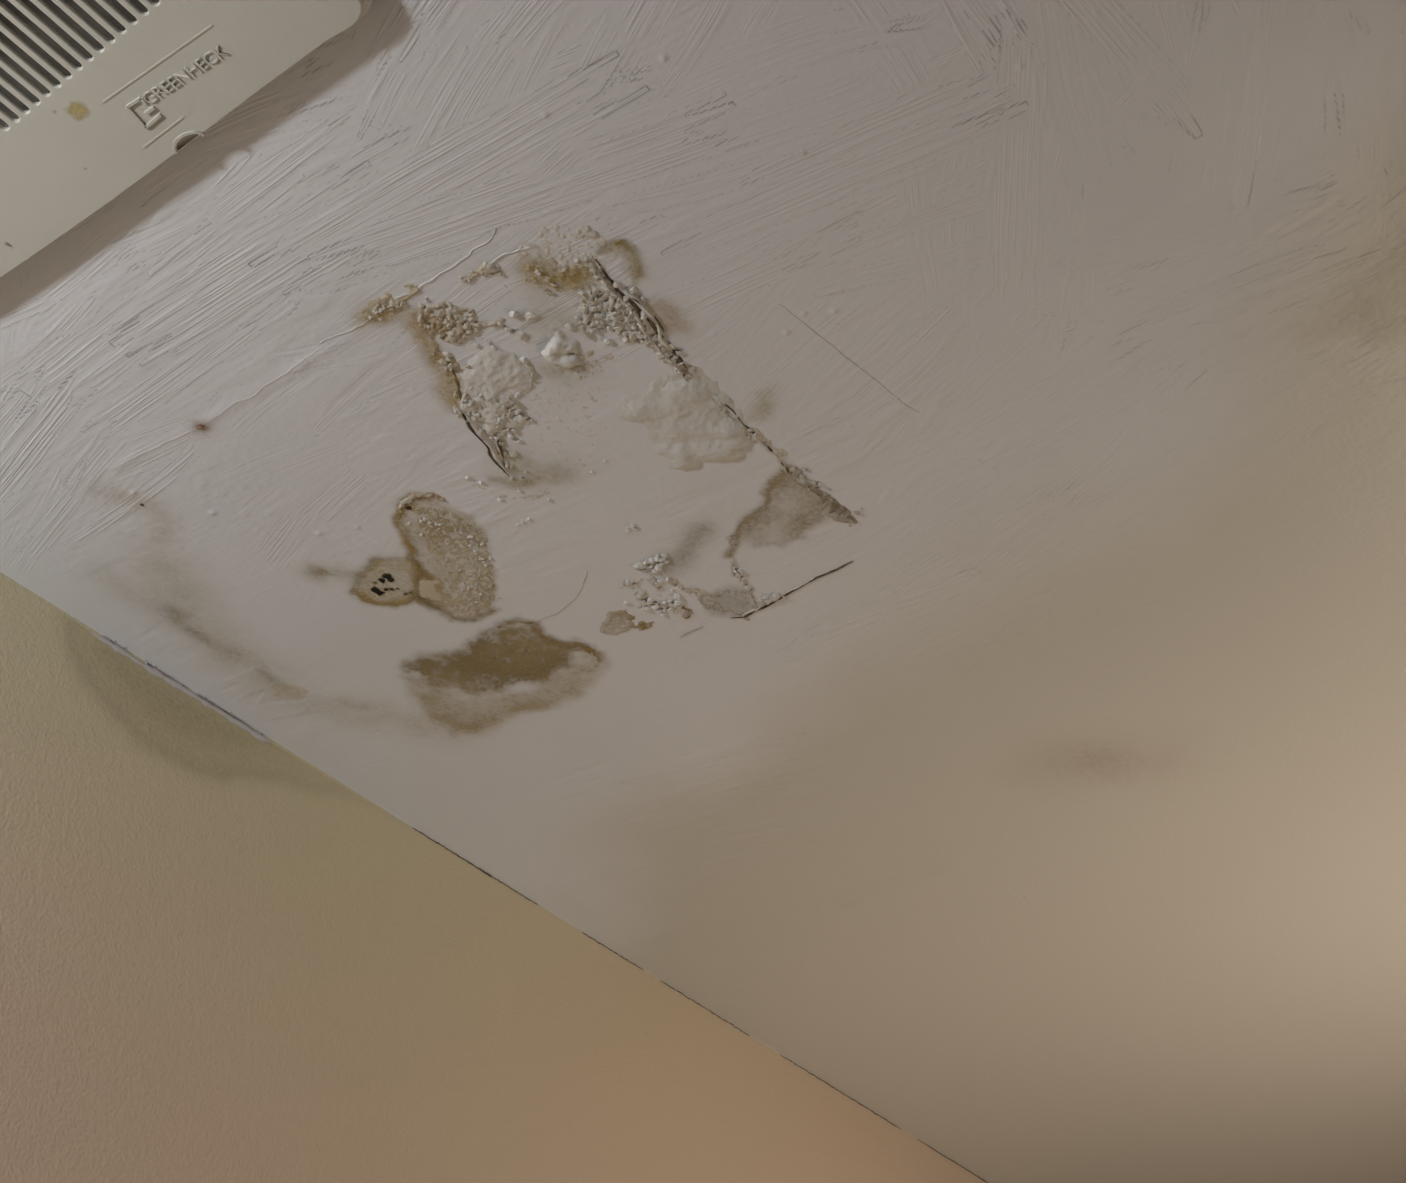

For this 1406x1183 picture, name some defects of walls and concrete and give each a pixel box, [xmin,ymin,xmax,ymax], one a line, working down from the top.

spalling [319,223,634,502]
water stain [350,558,432,607]
spalling [393,491,499,621]
peeling [600,535,853,638]
water stain [729,466,863,557]
water stain [411,621,603,731]